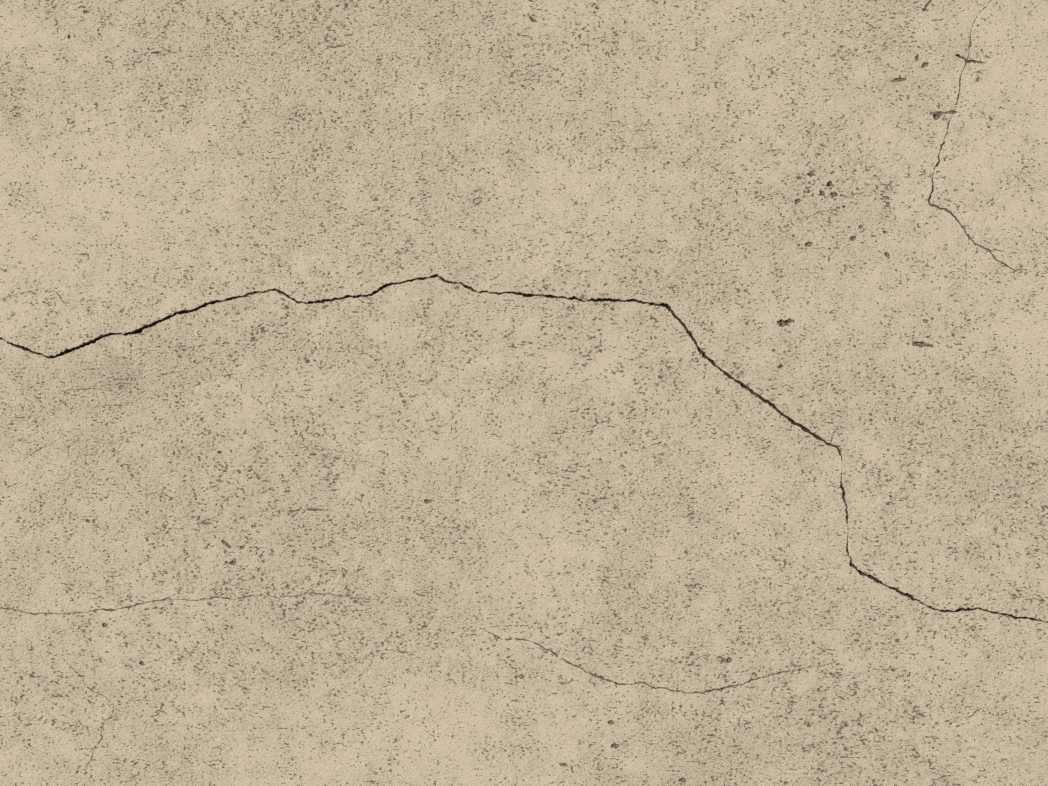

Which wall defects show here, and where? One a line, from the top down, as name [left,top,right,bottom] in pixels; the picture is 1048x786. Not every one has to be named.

crack [928,1,1028,272]
crack [0,274,1048,623]
crack [485,630,832,694]